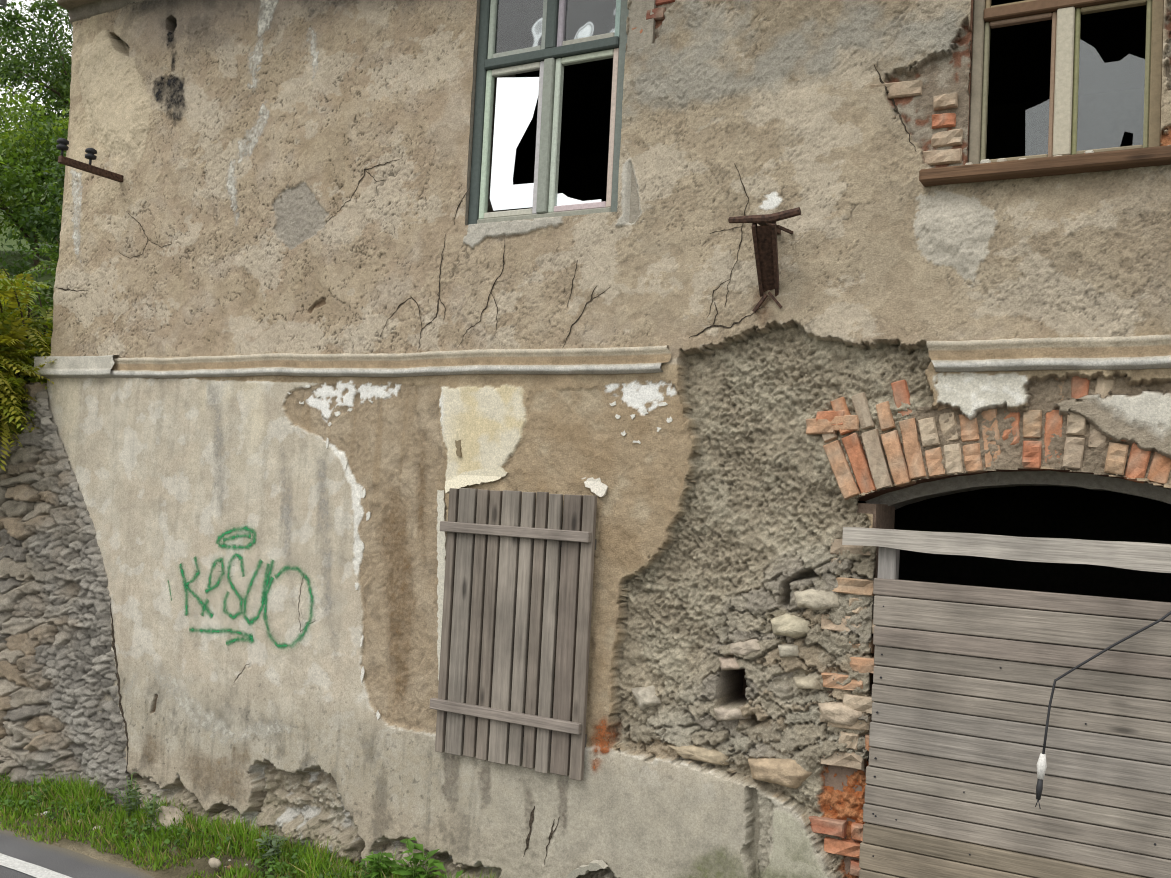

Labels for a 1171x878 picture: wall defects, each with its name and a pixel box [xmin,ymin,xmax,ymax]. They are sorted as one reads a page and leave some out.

flaking render [632,0,675,43]
flaking render [870,18,972,168]
crack [380,189,505,352]
crack [562,260,610,348]
flaking render [285,320,1171,878]
spalling [127,758,502,878]
crack [523,806,559,865]